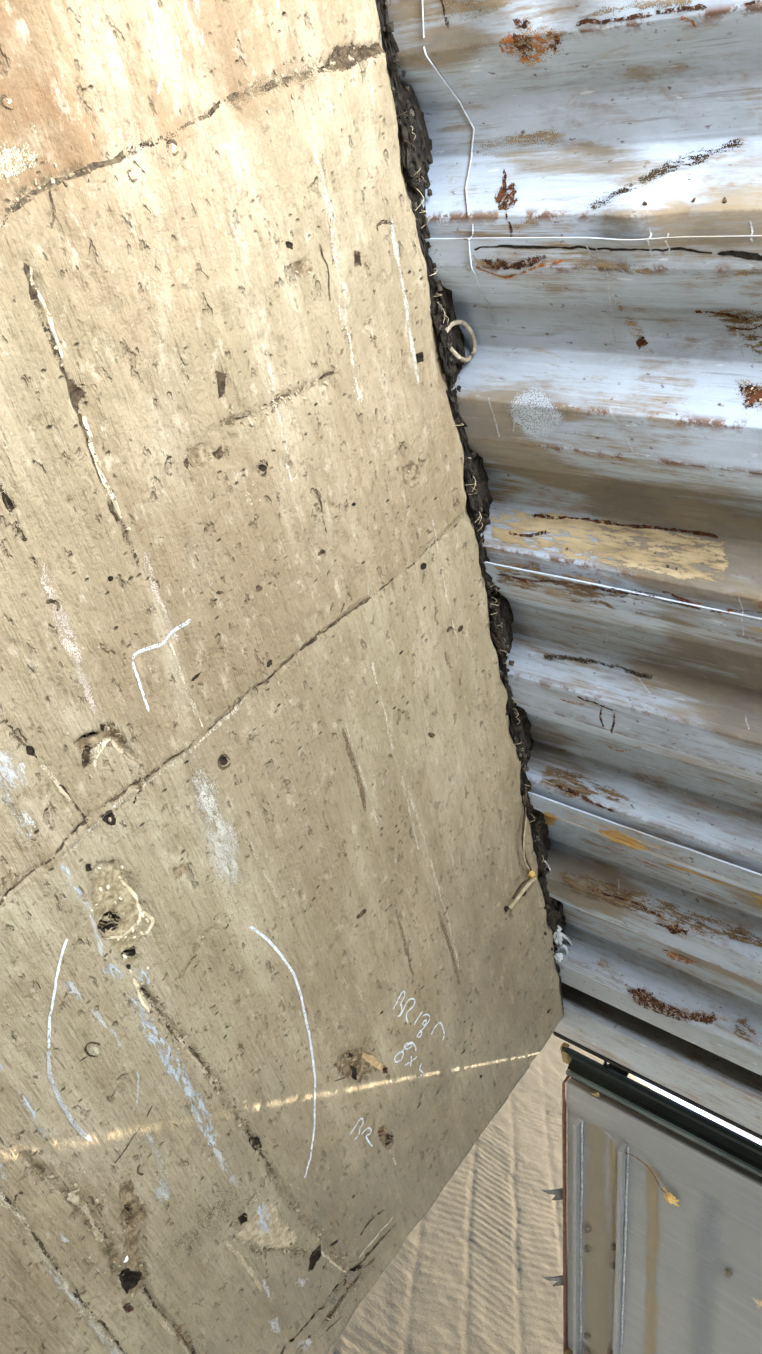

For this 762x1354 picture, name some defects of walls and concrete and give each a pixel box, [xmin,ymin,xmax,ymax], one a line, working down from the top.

corrosion [499,4,707,67]
crack [1,30,398,229]
corrosion [695,299,762,357]
crack [23,263,140,567]
corrosion [733,378,762,417]
crack [0,483,27,541]
crack [0,517,481,905]
corrosion [543,812,762,906]
corrosion [654,923,697,964]
corrosion [624,985,758,1043]
crack [128,977,397,1354]
crack [0,1147,196,1354]